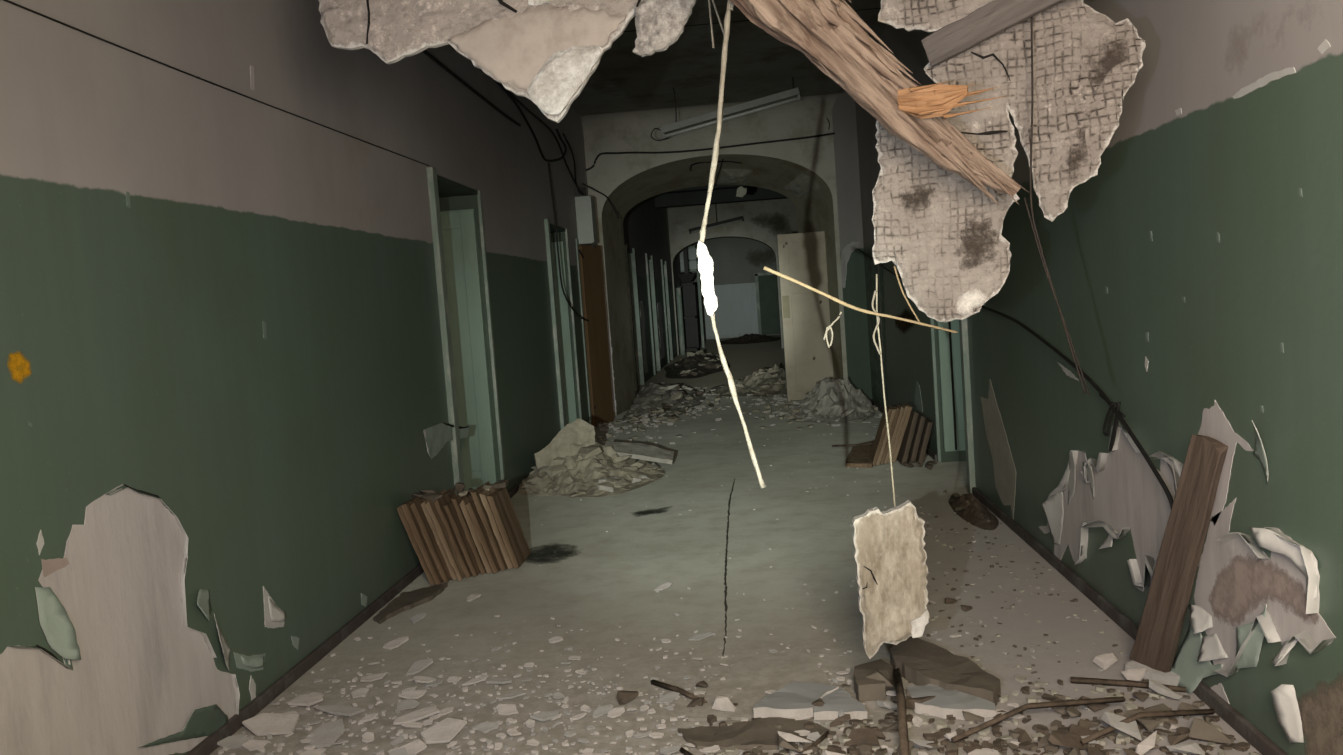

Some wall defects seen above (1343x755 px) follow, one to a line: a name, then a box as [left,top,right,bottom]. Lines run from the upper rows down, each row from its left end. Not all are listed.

peeling [718,169,753,197]
peeling [841,242,859,288]
peeling [604,284,617,412]
peeling [639,301,665,374]
peeling [0,484,266,755]
peeling [263,586,299,650]
crack [722,479,735,656]
peeling [1039,420,1184,592]
peeling [1171,400,1336,704]
peeling [1271,679,1343,755]